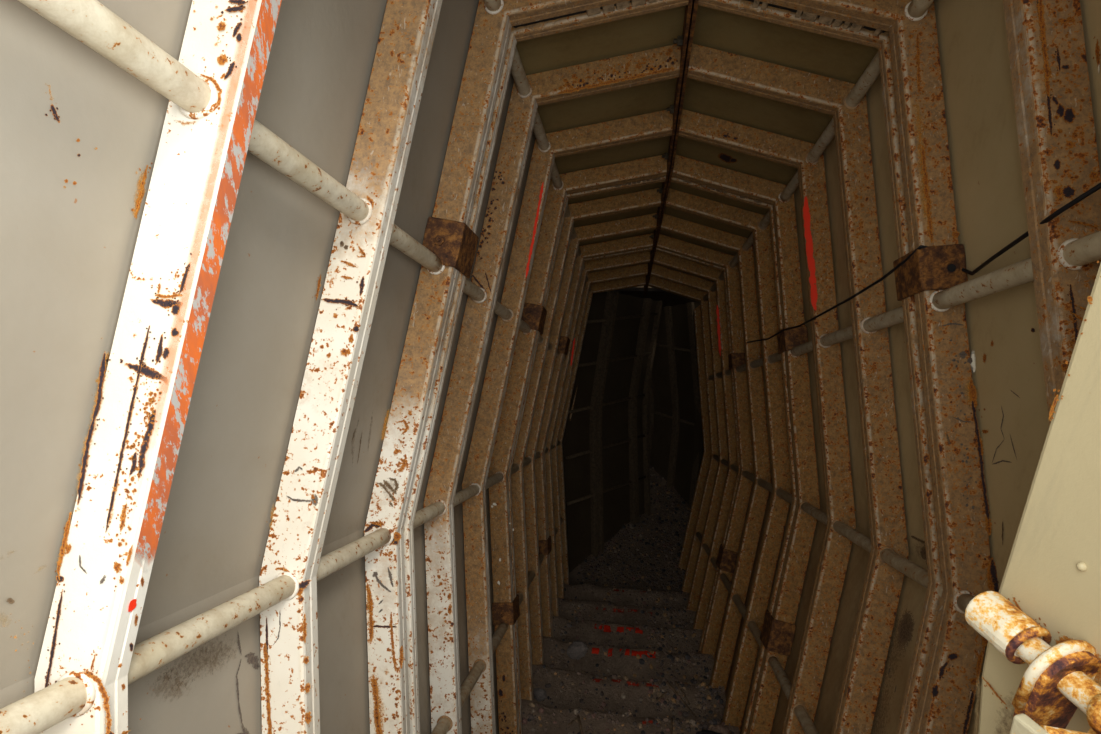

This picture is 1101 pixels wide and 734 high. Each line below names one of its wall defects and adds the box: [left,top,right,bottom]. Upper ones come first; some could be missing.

rust [200,0,248,114]
rust [1036,0,1098,228]
rust [131,163,152,218]
rust [312,241,367,374]
rust [45,253,192,688]
rust [363,517,385,532]
rust [379,532,402,558]
rust [382,406,416,477]
rust [70,650,129,734]
rust [263,618,275,734]
rust [366,580,404,734]